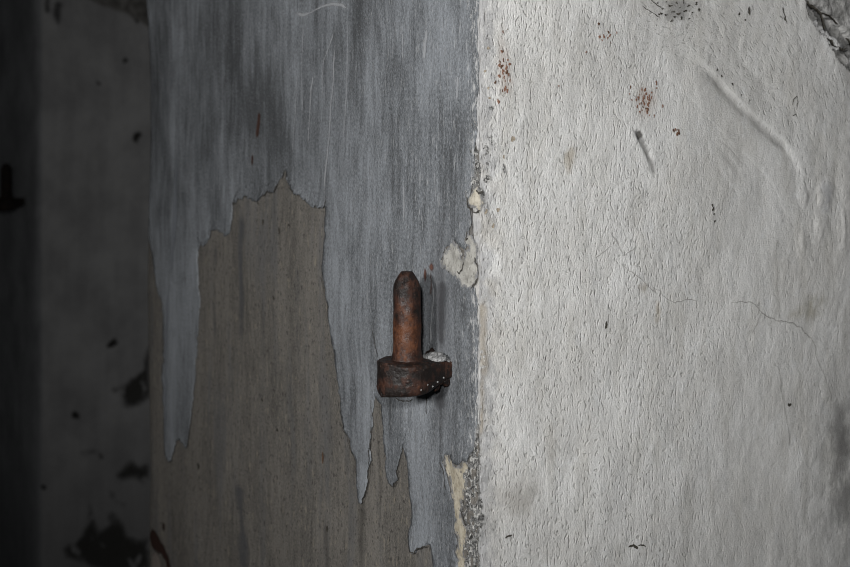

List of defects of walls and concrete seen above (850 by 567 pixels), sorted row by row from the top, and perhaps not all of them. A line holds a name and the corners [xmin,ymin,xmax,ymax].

spalling [805,0,850,71]
rust [494,50,511,104]
rust [629,81,657,117]
flaking render [465,121,500,214]
peeling [440,231,479,289]
crack [597,234,693,303]
crack [731,242,831,397]
peeling [148,171,433,567]
flaking render [439,421,484,567]